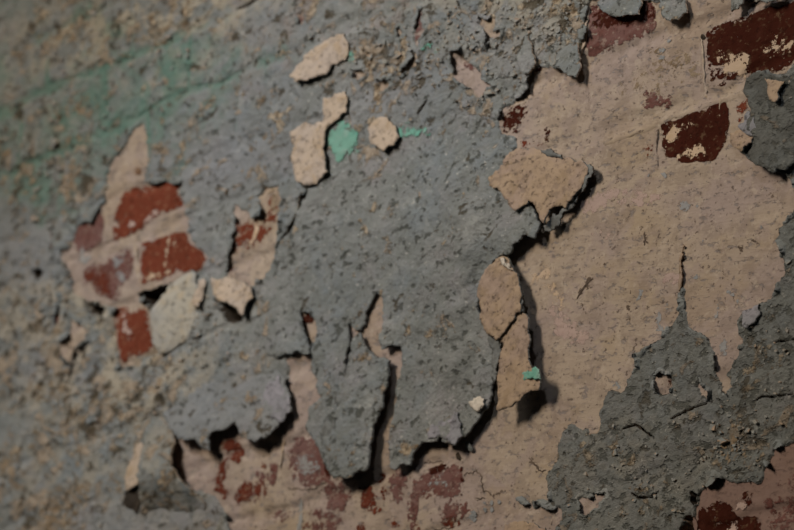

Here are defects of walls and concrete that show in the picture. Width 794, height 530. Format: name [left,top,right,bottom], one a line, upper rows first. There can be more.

peeling [289,5,428,94]
peeling [446,44,497,98]
peeling [290,92,349,186]
peeling [368,117,400,152]
peeling [51,123,287,372]
peeling [465,0,794,509]
peeling [122,294,562,530]
crack [622,424,652,436]
crack [671,399,720,419]
peeling [682,439,794,530]